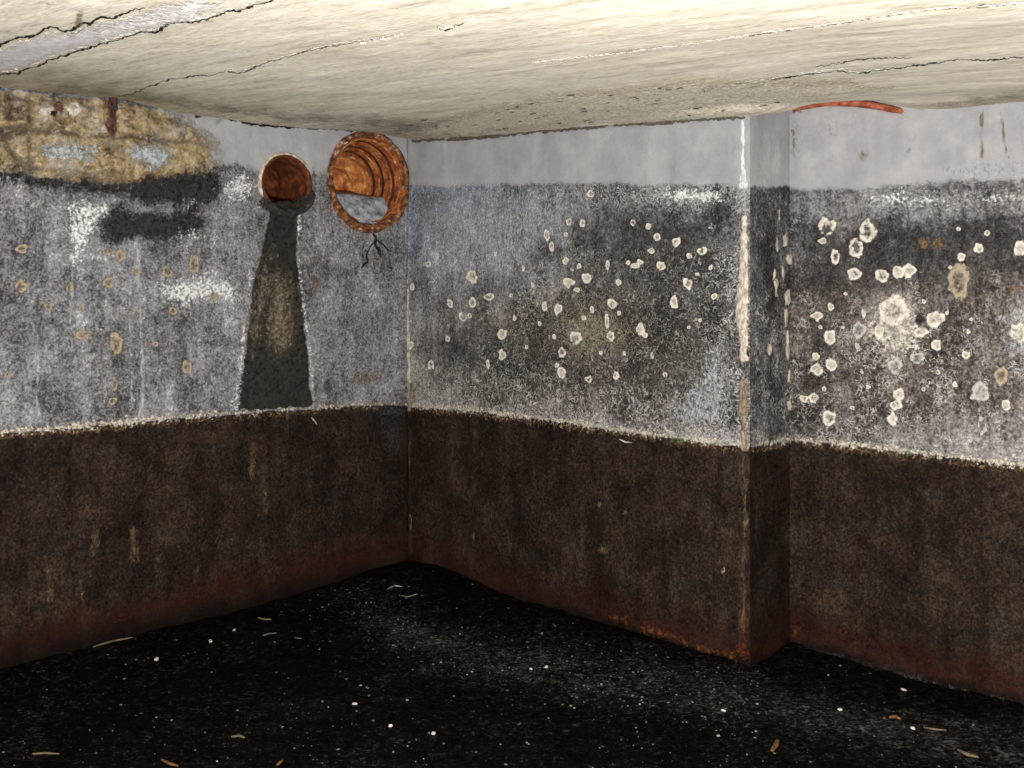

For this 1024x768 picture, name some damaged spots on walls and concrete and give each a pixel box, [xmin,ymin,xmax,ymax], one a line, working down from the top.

crack [0,0,274,75]
crack [114,33,403,98]
crack [734,57,1024,85]
rust [793,100,904,114]
flaking render [0,89,225,193]
crack [361,233,389,268]
leakage [0,119,1024,530]